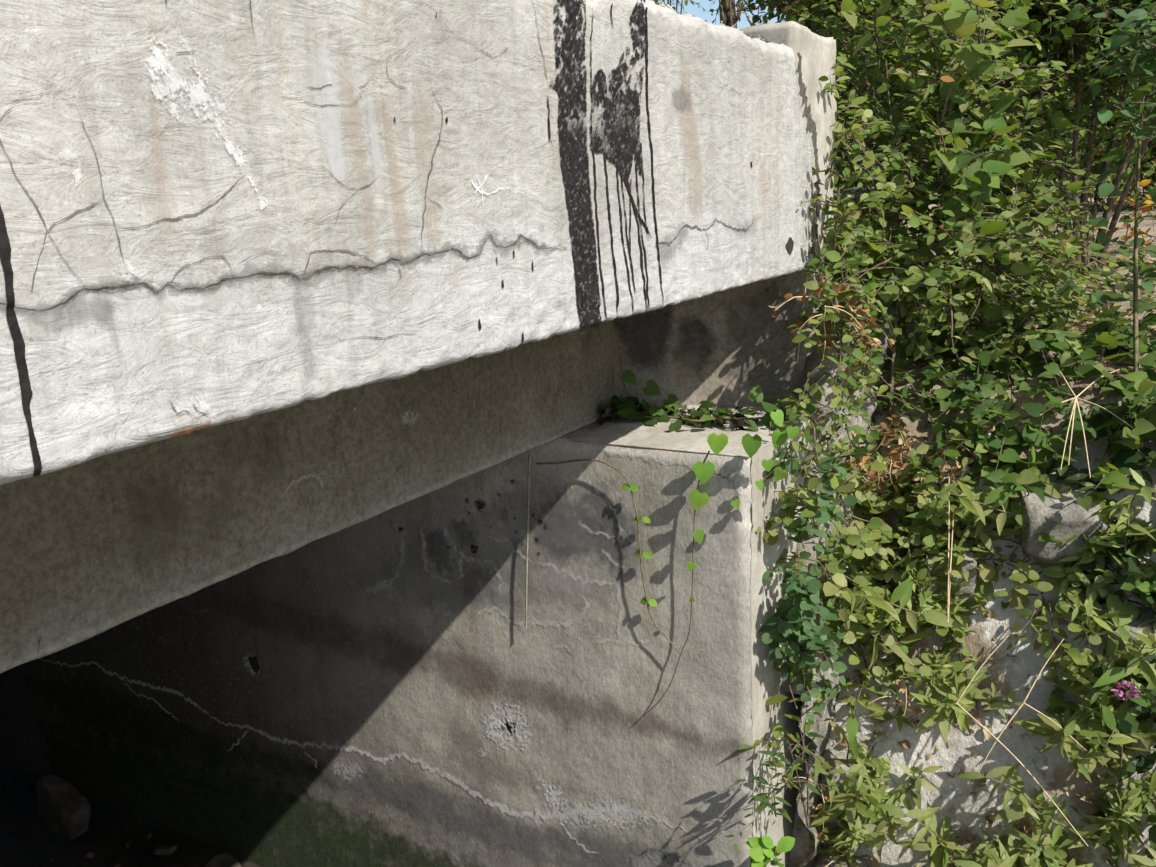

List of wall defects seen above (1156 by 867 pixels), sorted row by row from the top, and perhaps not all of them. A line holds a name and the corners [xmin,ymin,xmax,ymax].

peeling [146,36,267,210]
crack [0,61,566,311]
leakage [547,0,712,369]
crack [655,217,755,249]
leakage [512,496,624,563]